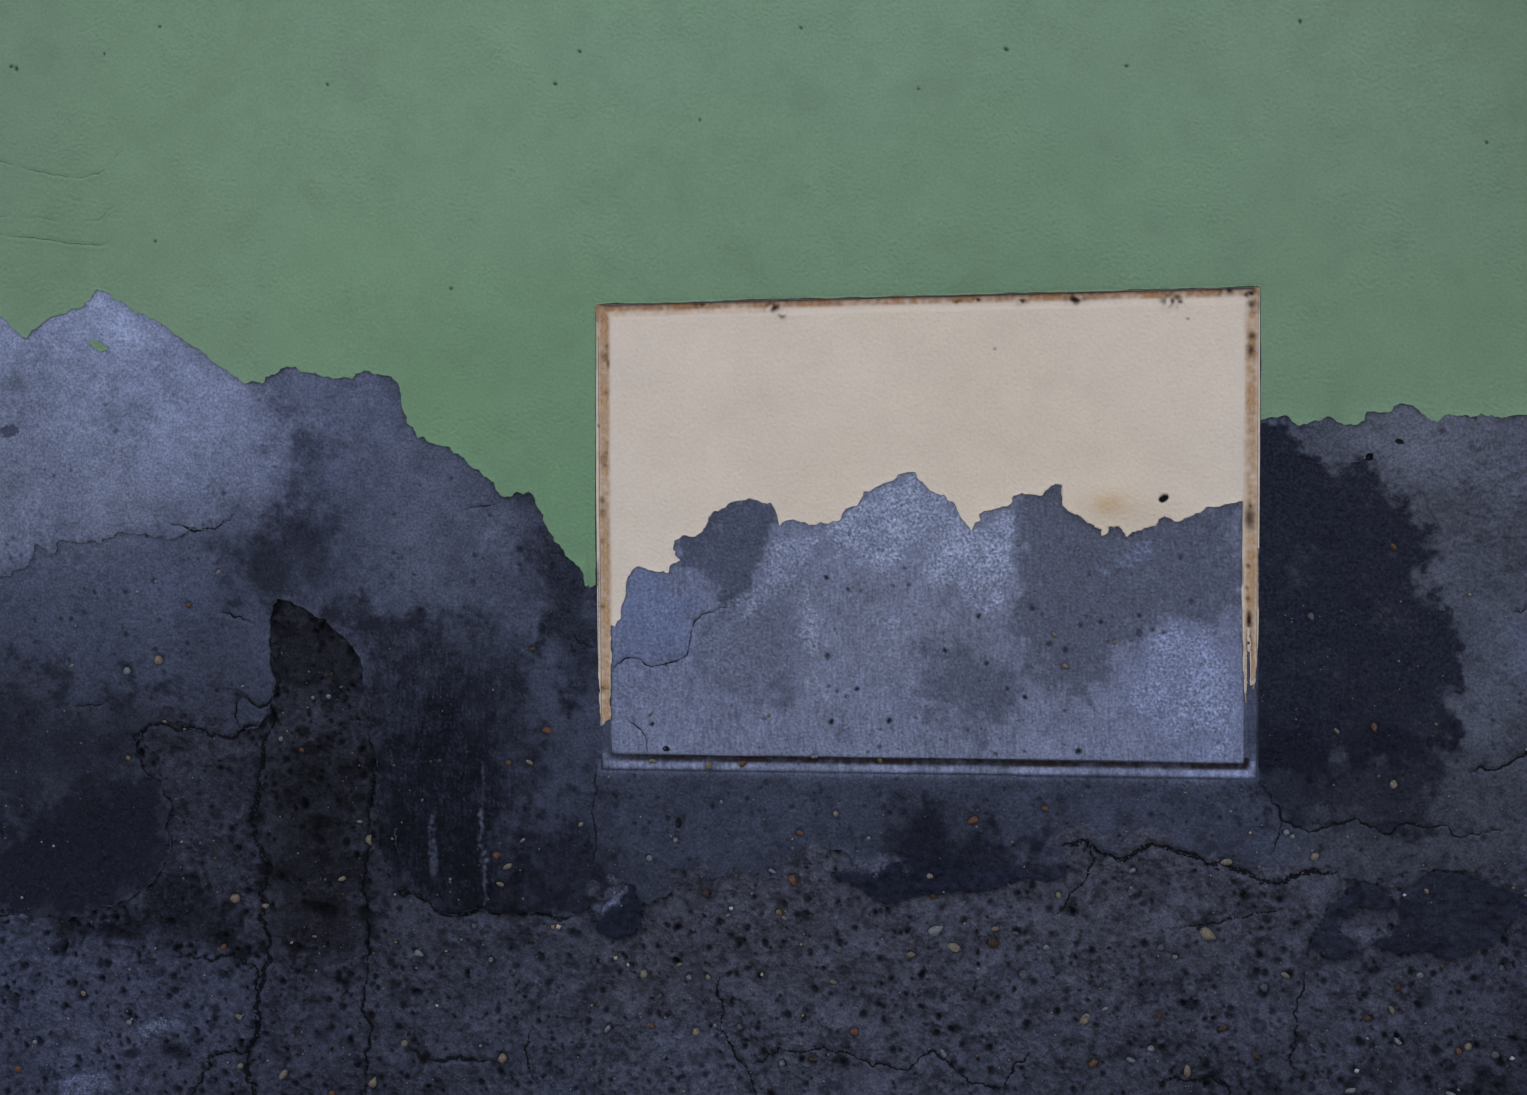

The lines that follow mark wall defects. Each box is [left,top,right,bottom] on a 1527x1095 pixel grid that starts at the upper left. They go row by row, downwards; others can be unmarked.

water stain [0,694,251,976]
crack [132,682,280,1095]
water stain [254,493,621,927]
crack [359,751,576,1095]
spalling [0,286,1527,1095]
water stain [1125,577,1239,761]
water stain [1249,421,1465,840]
crack [1471,751,1527,772]